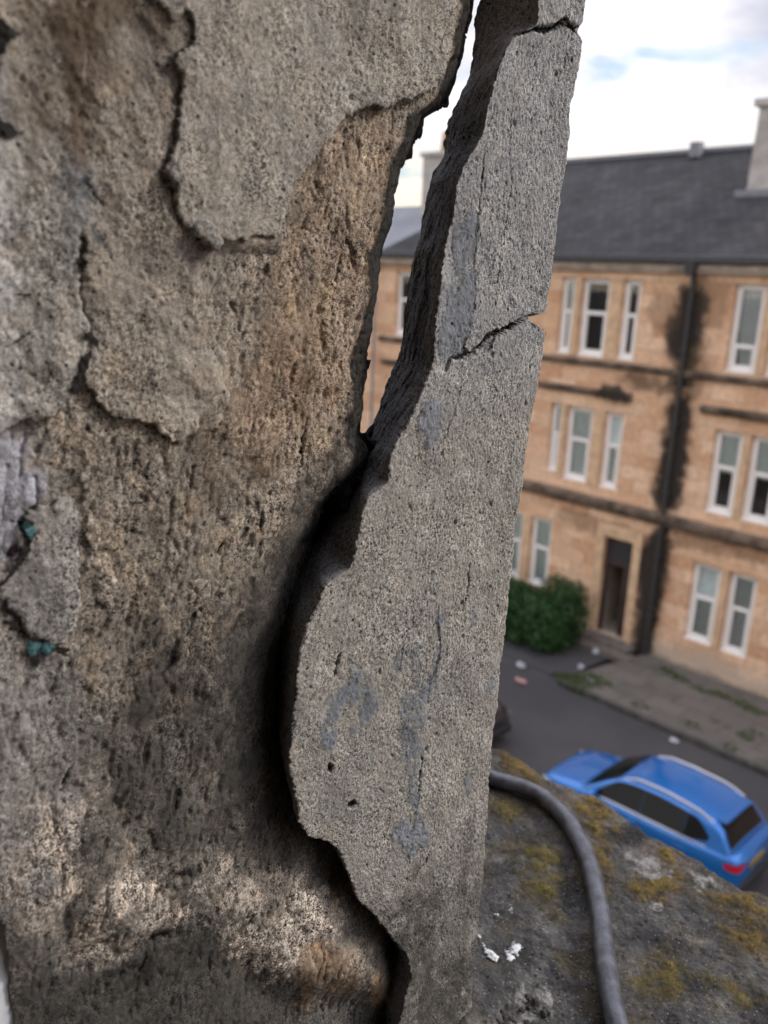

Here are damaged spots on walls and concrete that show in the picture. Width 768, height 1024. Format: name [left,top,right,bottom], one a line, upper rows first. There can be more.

crack [513,17,577,36]
peeling [0,0,457,724]
crack [453,322,516,359]
water stain [650,283,710,512]
crack [427,611,440,703]
rust [297,943,355,1009]